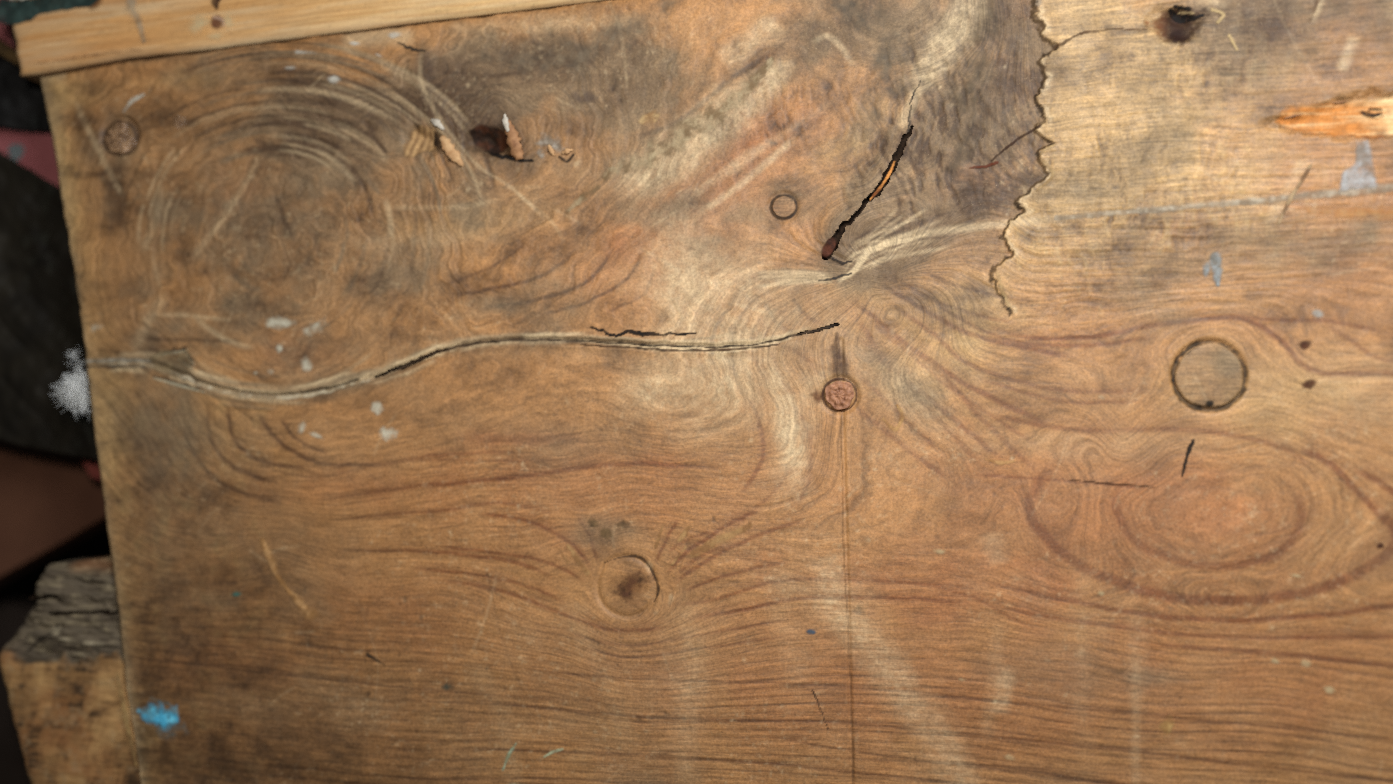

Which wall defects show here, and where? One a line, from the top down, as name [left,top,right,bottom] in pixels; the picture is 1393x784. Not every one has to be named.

crack [1054,28,1133,49]
spalling [1277,96,1393,137]
crack [971,125,1041,168]
crack [820,87,918,281]
crack [86,323,838,399]